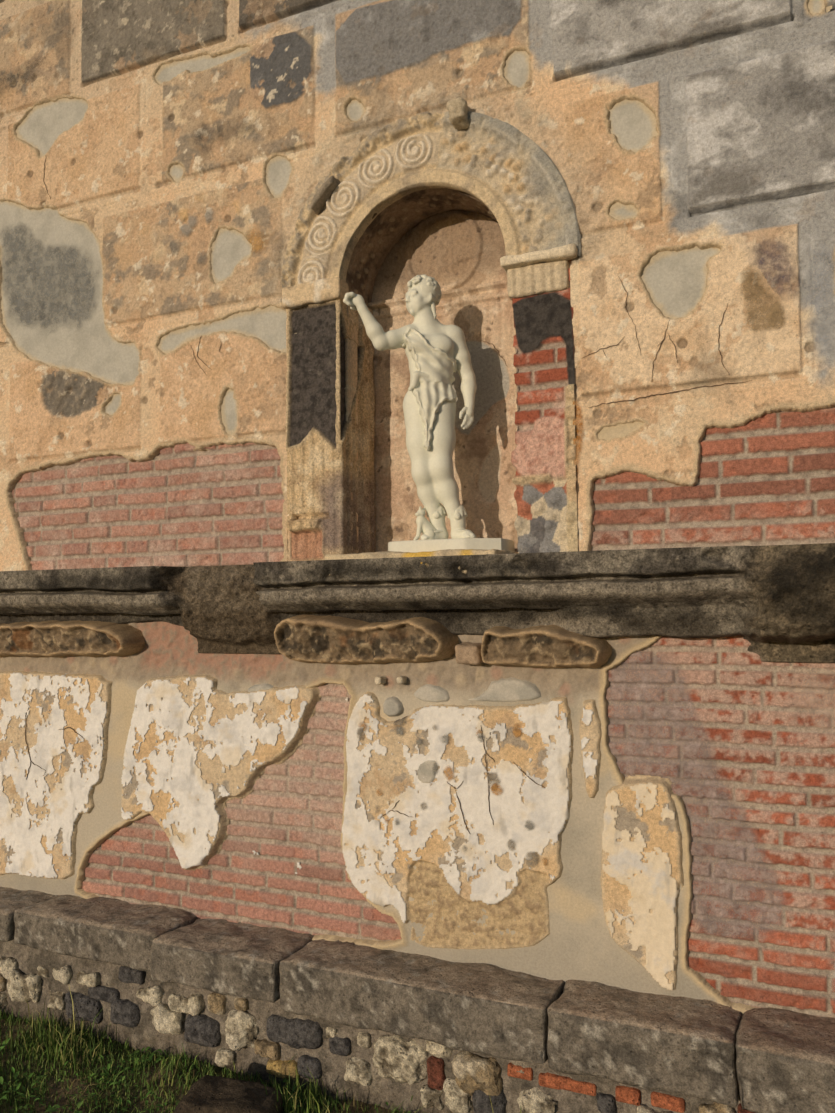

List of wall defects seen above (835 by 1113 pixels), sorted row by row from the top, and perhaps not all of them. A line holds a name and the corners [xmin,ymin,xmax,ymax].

crack [583,276,752,408]
flaking render [12,443,285,570]
flaking render [591,407,835,551]
flaking render [0,636,835,1018]